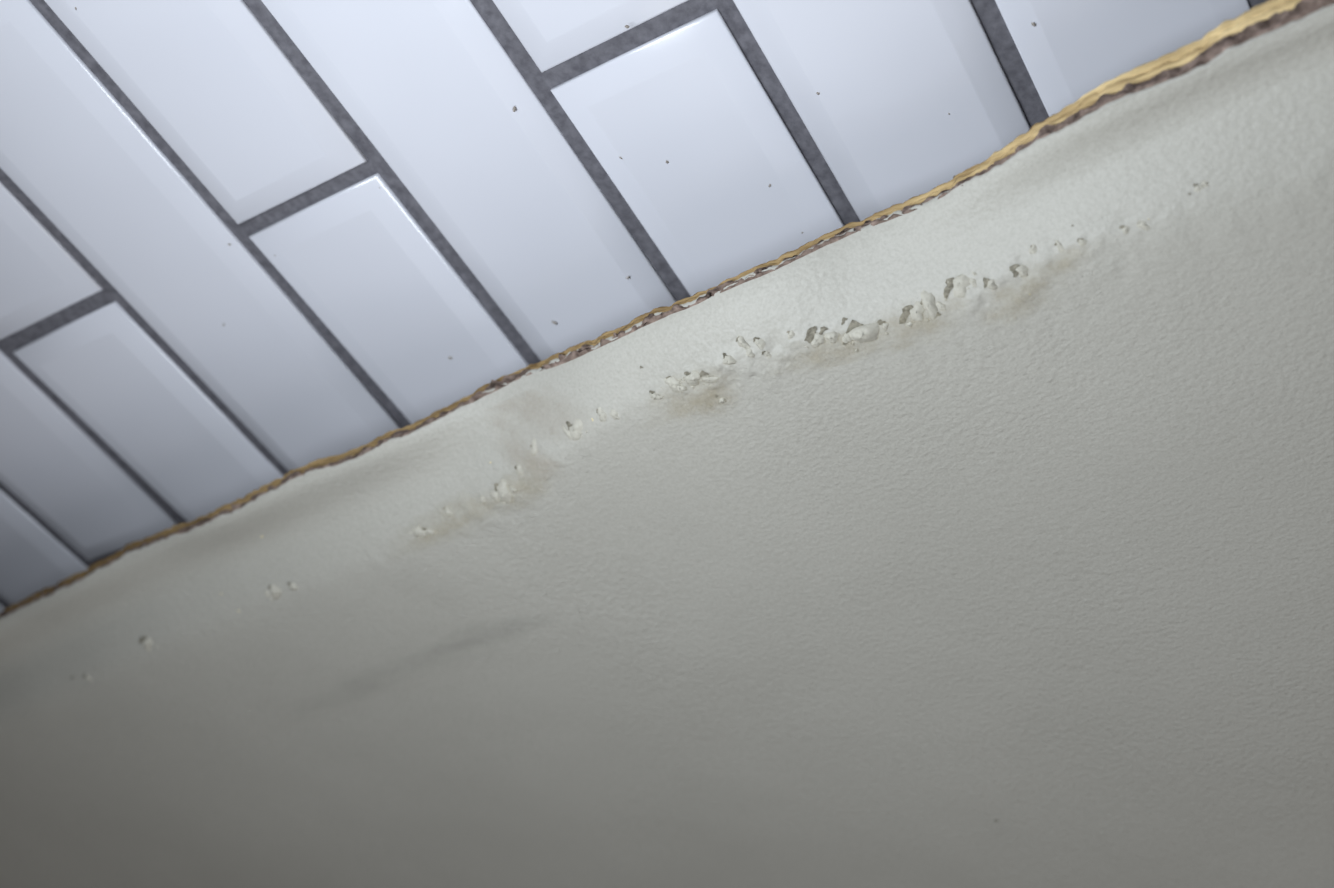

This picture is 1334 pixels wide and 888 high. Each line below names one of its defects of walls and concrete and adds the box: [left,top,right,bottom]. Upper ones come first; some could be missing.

peeling [786,289,947,352]
peeling [649,335,772,404]